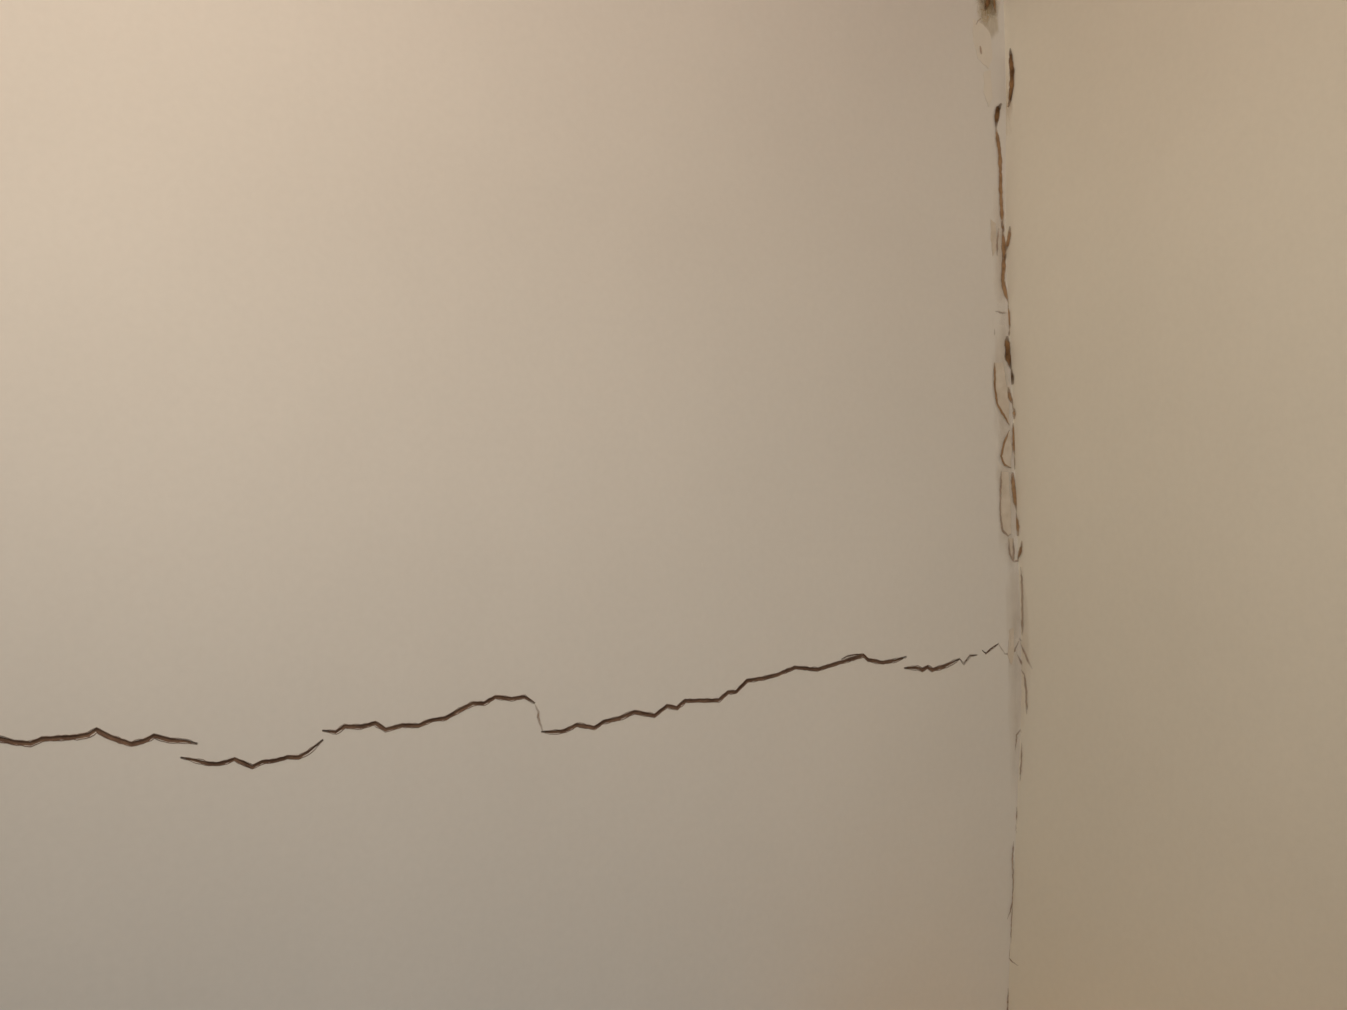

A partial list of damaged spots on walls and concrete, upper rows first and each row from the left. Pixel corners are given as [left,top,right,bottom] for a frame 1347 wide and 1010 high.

crack [985,0,996,10]
crack [0,49,1028,775]
crack [1007,814,1017,1010]